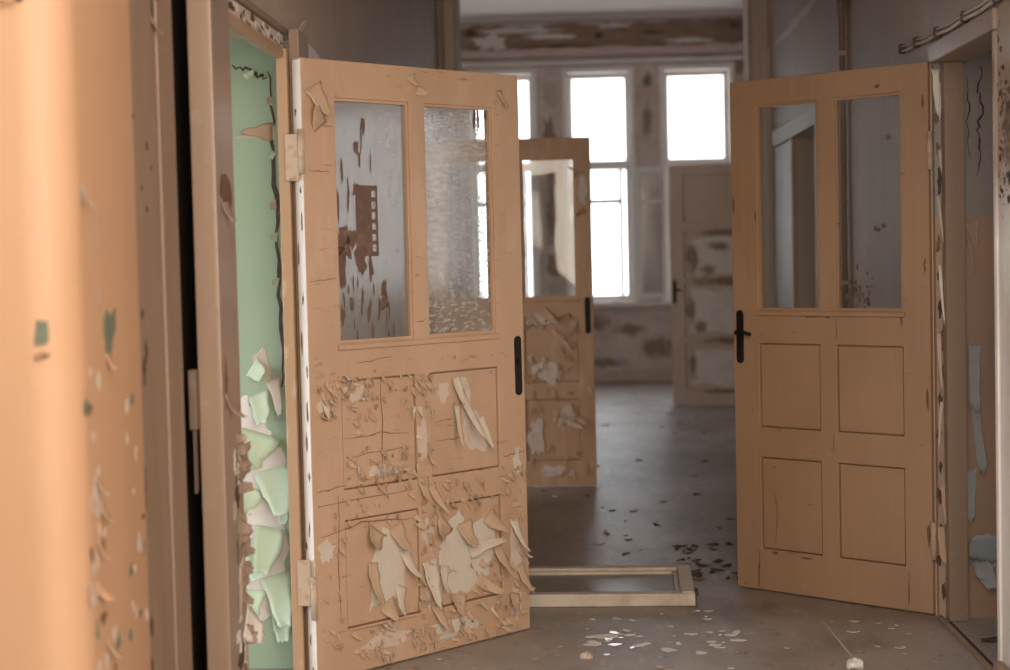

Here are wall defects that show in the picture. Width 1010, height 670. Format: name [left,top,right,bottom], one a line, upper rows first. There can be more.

peeling [460,17,743,51]
crack [966,67,984,176]
peeling [34,321,51,362]
peeling [103,308,119,370]
peeling [967,345,987,525]
peeling [90,466,133,670]
peeling [224,347,292,670]
peeling [968,533,997,590]